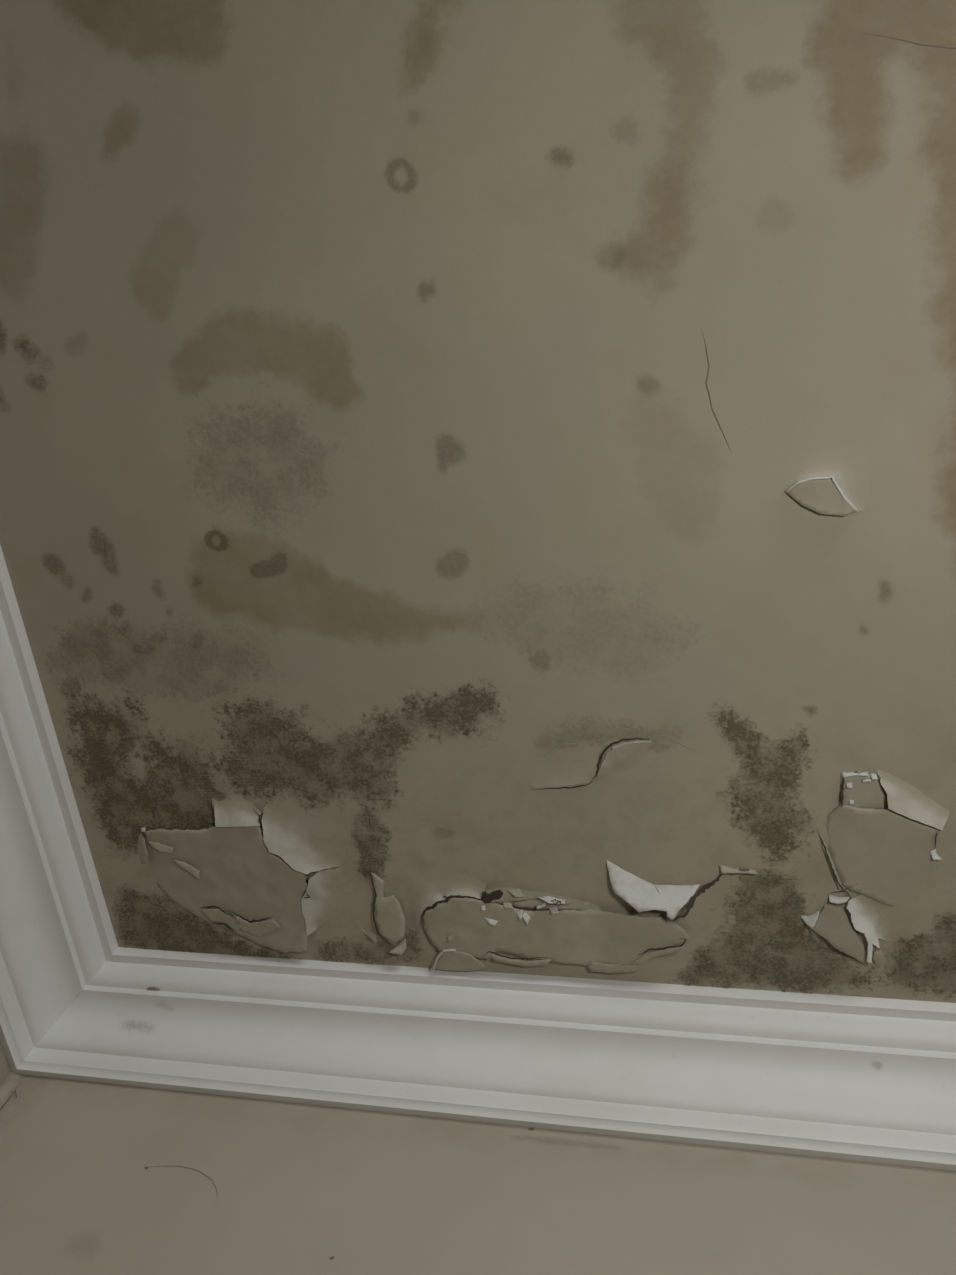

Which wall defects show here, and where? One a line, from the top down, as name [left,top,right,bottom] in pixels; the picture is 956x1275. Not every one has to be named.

leakage [356,0,508,126]
leakage [0,0,258,331]
leakage [113,189,389,433]
leakage [562,0,956,734]
peeling [777,438,871,516]
leakage [168,503,502,664]
leakage [115,887,289,959]
peeling [136,795,347,953]
mould [68,684,499,878]
peeling [359,859,758,973]
leakage [680,710,846,994]
peeling [800,770,950,968]